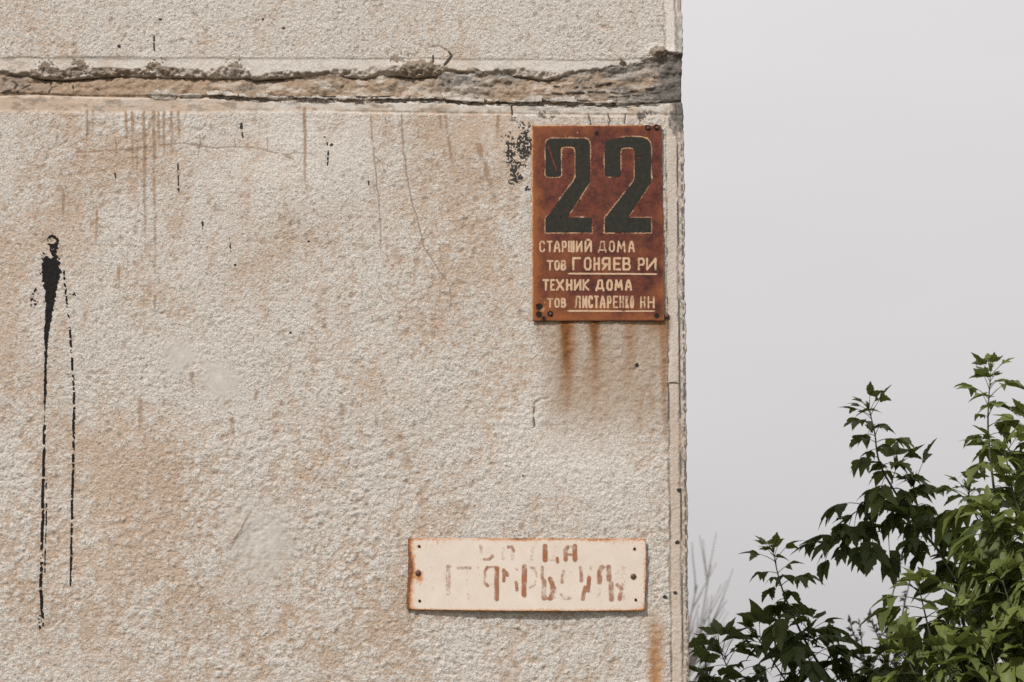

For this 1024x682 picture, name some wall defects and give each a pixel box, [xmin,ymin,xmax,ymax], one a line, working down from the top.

spalling [30,55,180,78]
spalling [388,47,442,78]
spalling [649,46,682,56]
peeling [148,90,577,105]
leakage [125,110,179,210]
corrosion [557,321,605,399]